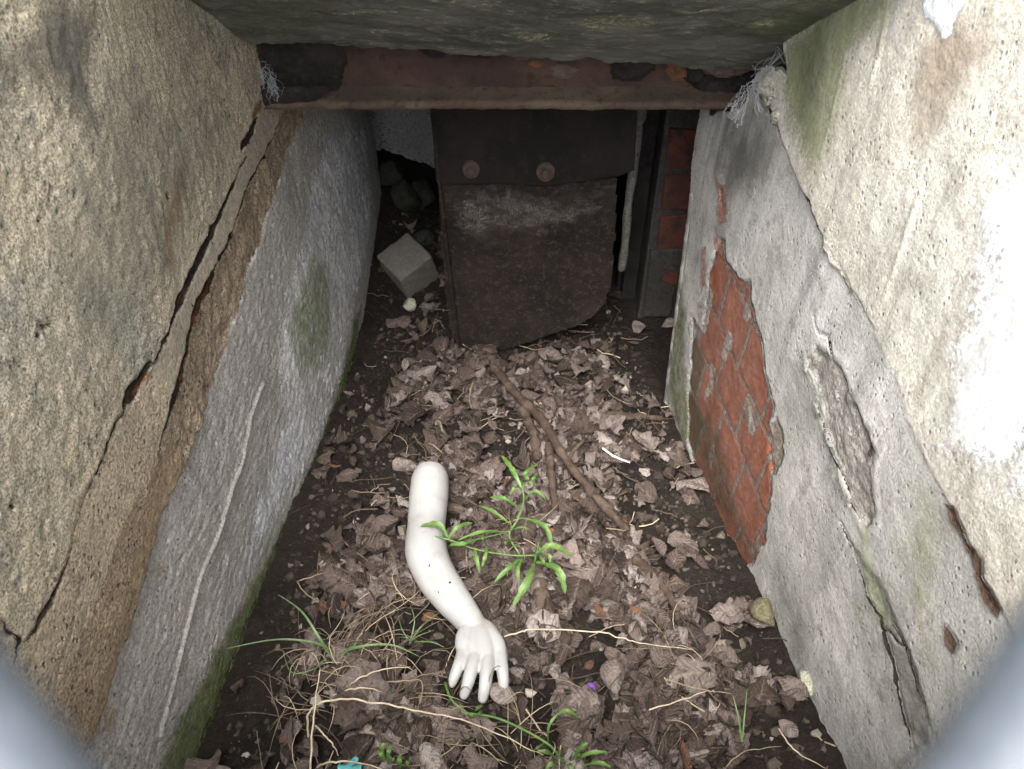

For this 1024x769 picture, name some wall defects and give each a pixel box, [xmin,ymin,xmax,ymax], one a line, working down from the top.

rust [609,62,687,82]
crack [1,100,279,659]
damp [239,118,373,575]
flaking render [685,179,784,567]
spalling [802,328,875,528]
crack [842,528,929,748]